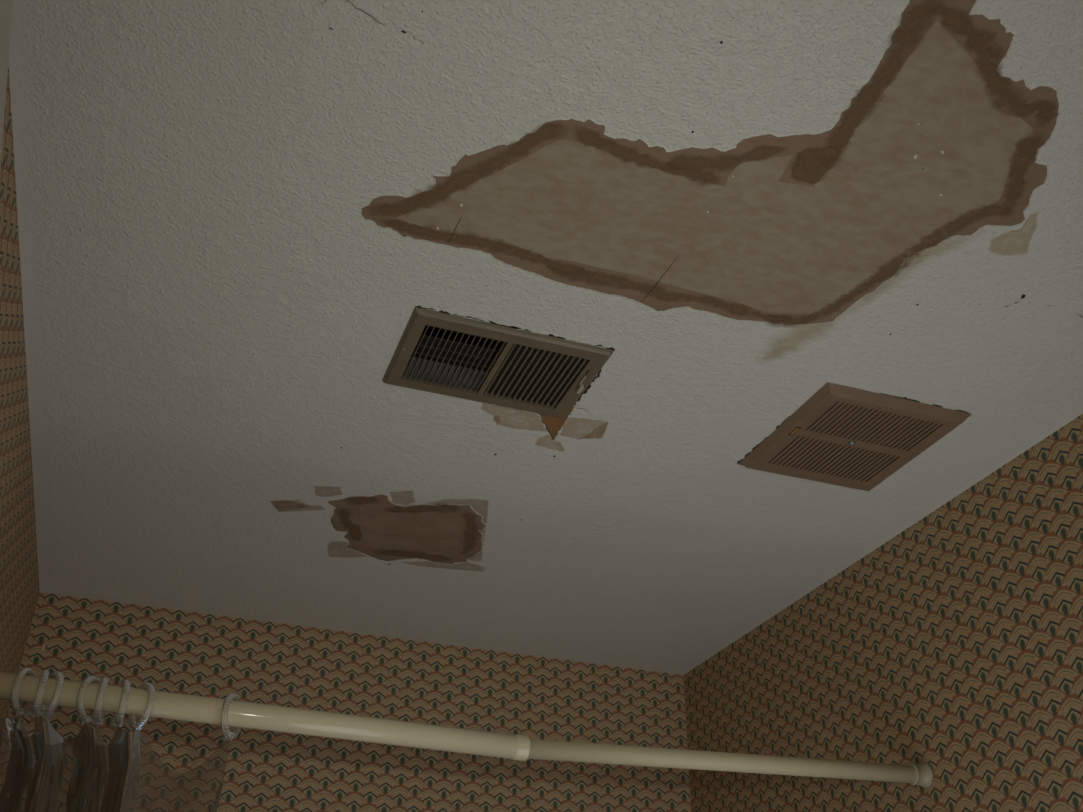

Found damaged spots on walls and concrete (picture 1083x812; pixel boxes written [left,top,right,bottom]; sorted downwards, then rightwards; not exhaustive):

peeling [359,0,1061,326]
peeling [327,493,487,565]